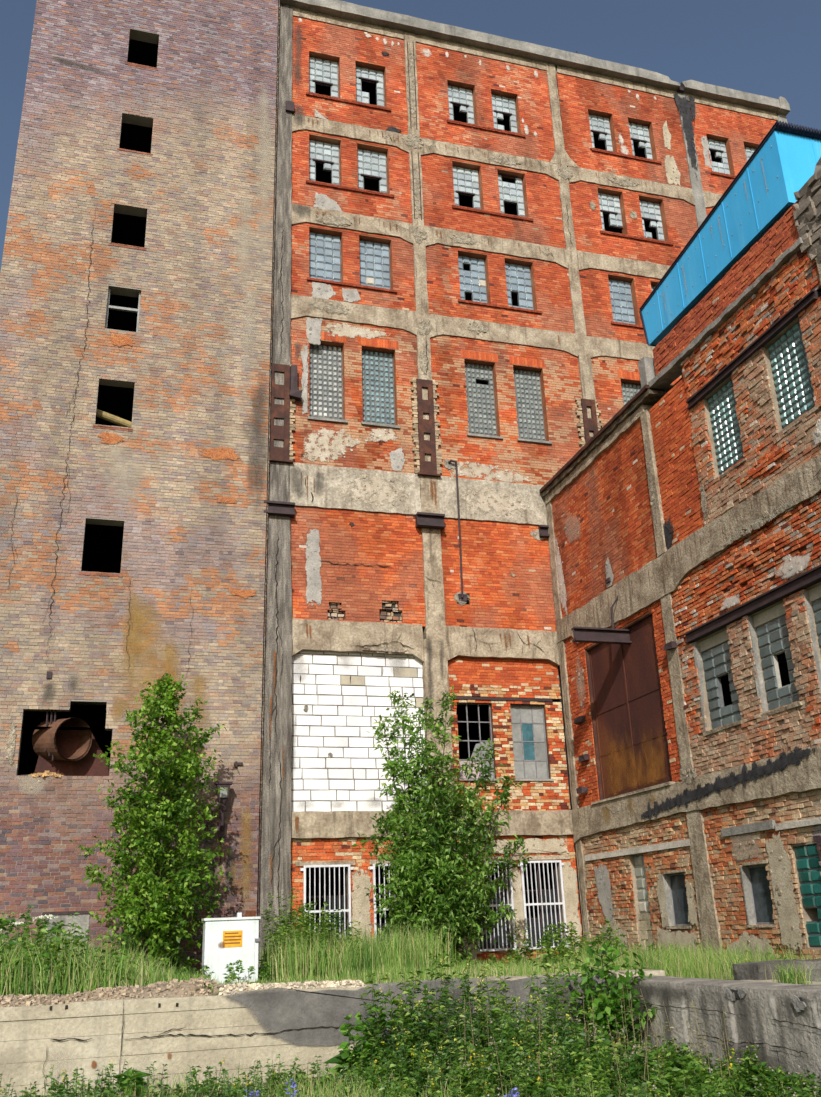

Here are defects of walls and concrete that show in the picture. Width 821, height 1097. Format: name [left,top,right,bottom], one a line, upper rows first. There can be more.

peeling [663,120,681,185]
water stain [673,94,697,177]
crack [43,208,96,665]
peeling [289,282,530,519]
peeling [813,418,821,447]
peeling [775,553,810,578]
water stain [647,746,800,820]
crack [43,1038,92,1087]
crack [119,1005,391,1074]